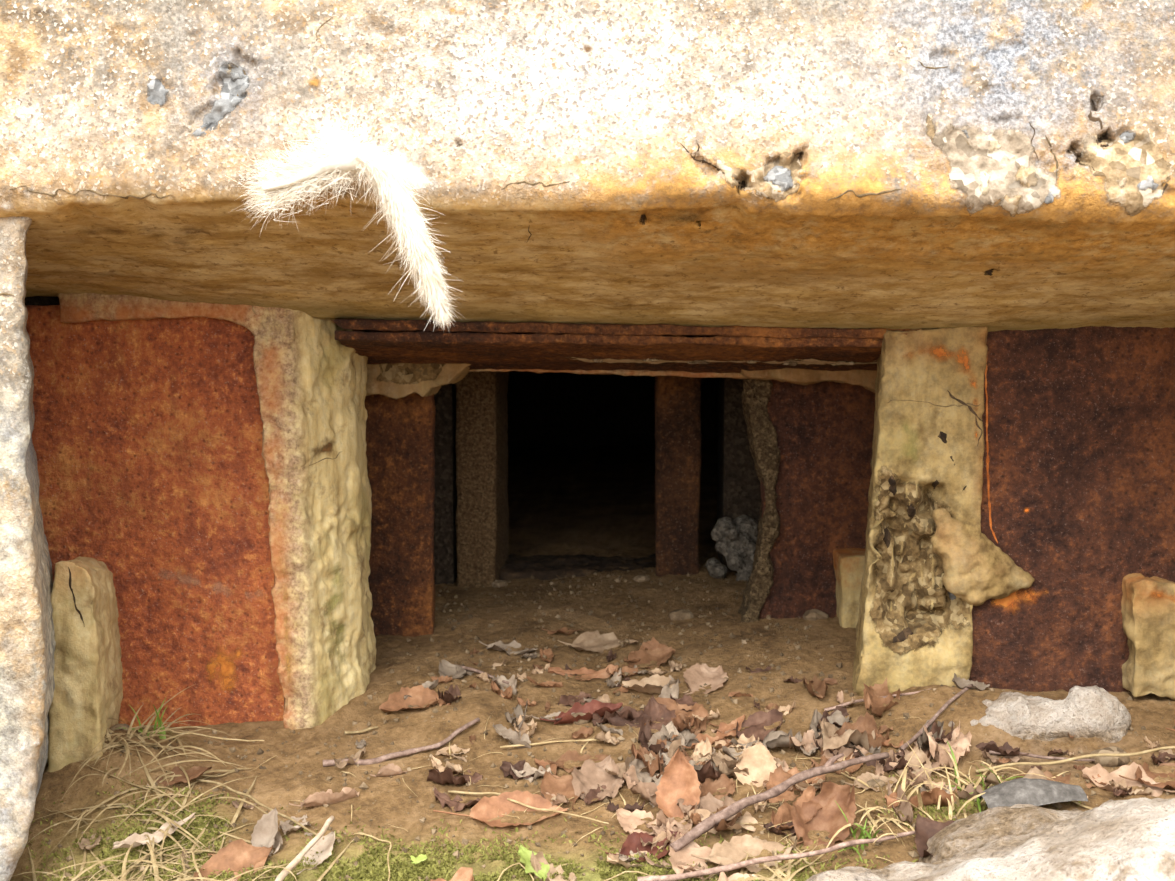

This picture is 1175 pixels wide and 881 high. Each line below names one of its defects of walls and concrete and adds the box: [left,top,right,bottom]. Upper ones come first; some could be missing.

spalling [713,152,806,202]
spalling [925,114,1061,217]
spalling [1071,130,1172,216]
spalling [869,466,970,655]
crack [68,567,84,623]
rust [993,591,1037,609]
rust [207,651,241,690]